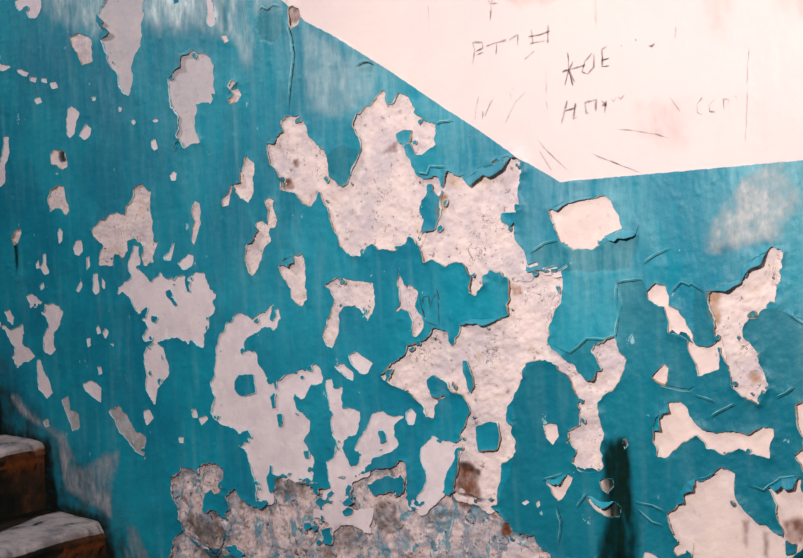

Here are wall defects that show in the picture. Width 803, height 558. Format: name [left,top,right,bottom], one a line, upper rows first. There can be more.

peeling [0,136,9,187]
peeling [15,0,41,18]
peeling [47,185,69,215]
peeling [66,106,91,140]
peeling [69,0,144,96]
peeling [167,48,215,151]
crack [242,3,295,104]
peeling [0,253,63,398]
peeling [73,184,216,460]
peeling [168,90,639,558]
peeling [647,246,783,404]
peeling [652,401,803,558]